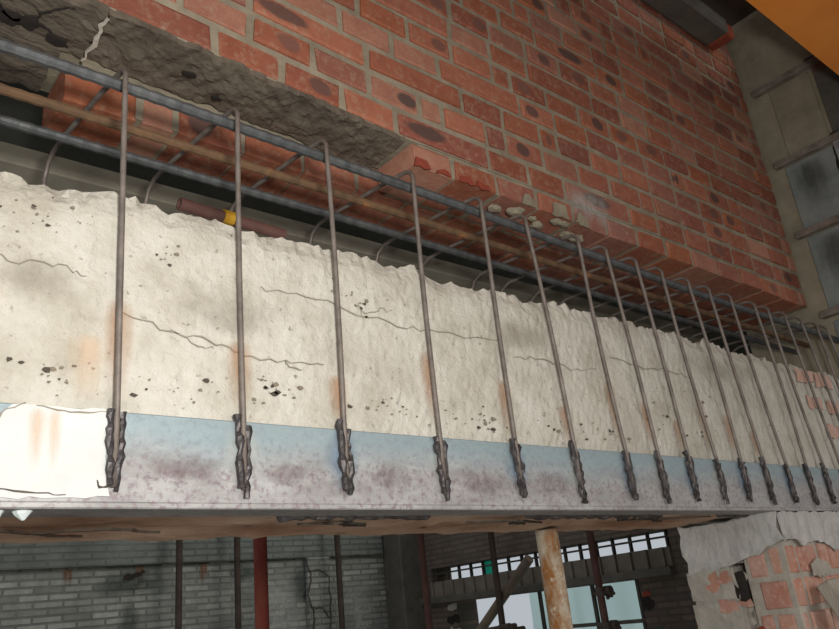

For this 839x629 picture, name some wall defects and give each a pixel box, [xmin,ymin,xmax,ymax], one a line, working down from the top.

crack [0,253,83,276]
spalling [40,365,77,384]
crack [123,312,324,370]
crack [261,286,498,341]
crack [521,356,689,378]
peeling [0,402,109,499]
crack [307,559,332,629]
spalling [705,570,766,629]